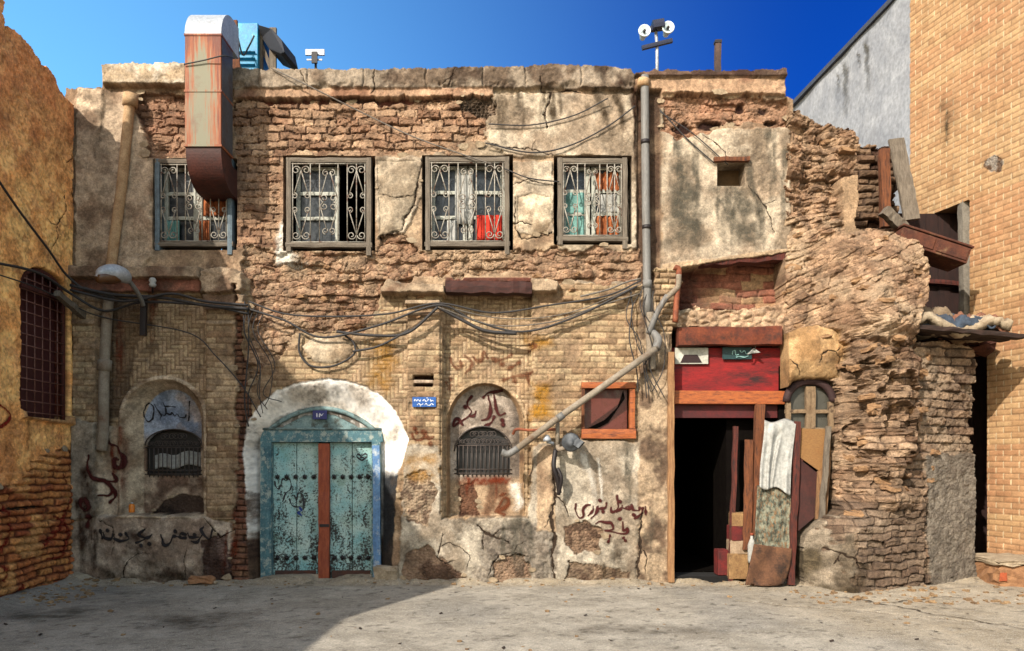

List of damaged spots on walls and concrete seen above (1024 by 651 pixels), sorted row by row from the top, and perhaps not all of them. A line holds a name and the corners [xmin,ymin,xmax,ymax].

crack [379,160,422,240]
crack [513,179,553,240]
water stain [669,141,701,242]
water stain [716,168,761,241]
crack [748,185,775,233]
flaking render [200,93,643,583]
crack [437,472,569,578]